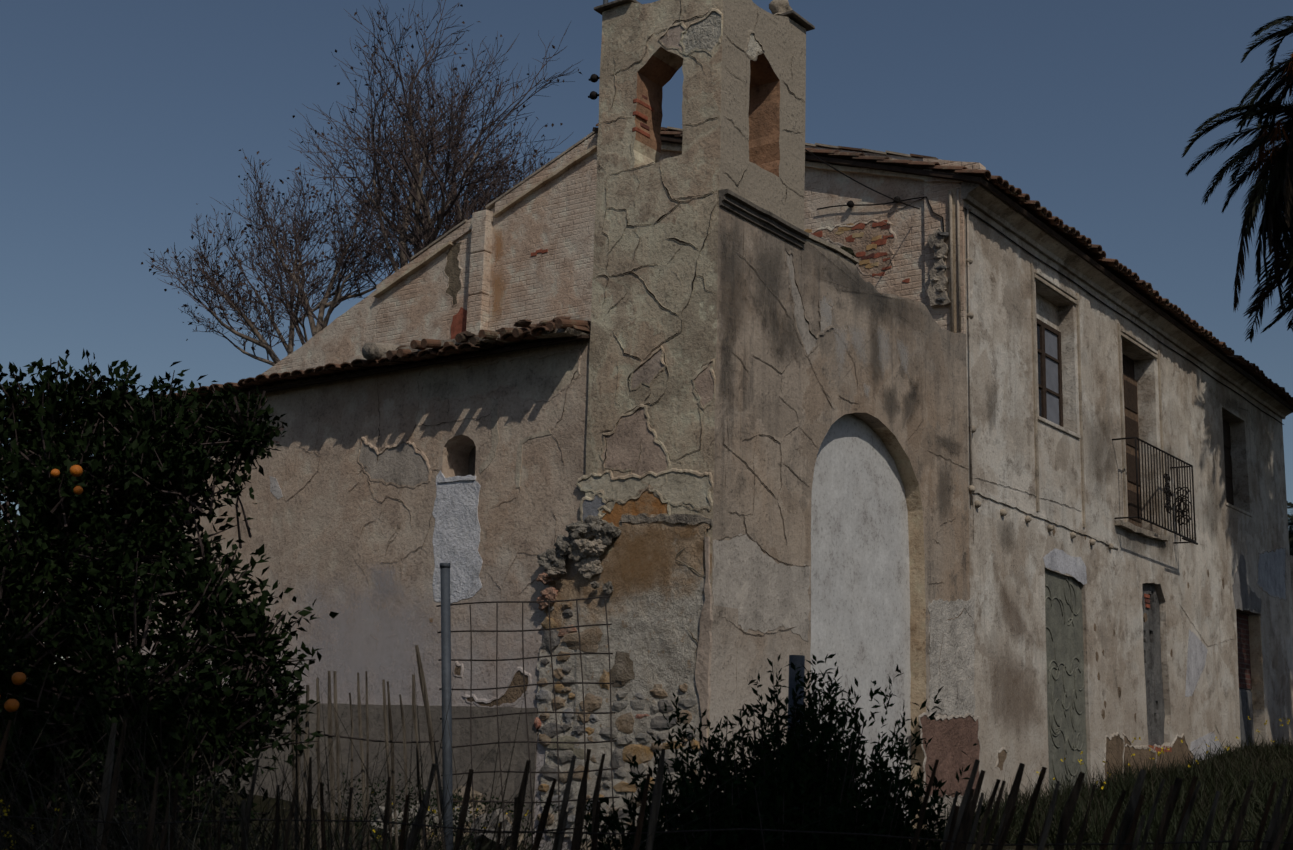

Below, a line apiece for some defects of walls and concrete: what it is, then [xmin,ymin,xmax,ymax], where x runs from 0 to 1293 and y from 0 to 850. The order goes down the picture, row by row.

crack [550,0,860,577]
spalling [804,219,910,283]
spalling [927,228,951,308]
crack [349,379,492,575]
spalling [462,346,810,841]
crack [721,617,794,636]